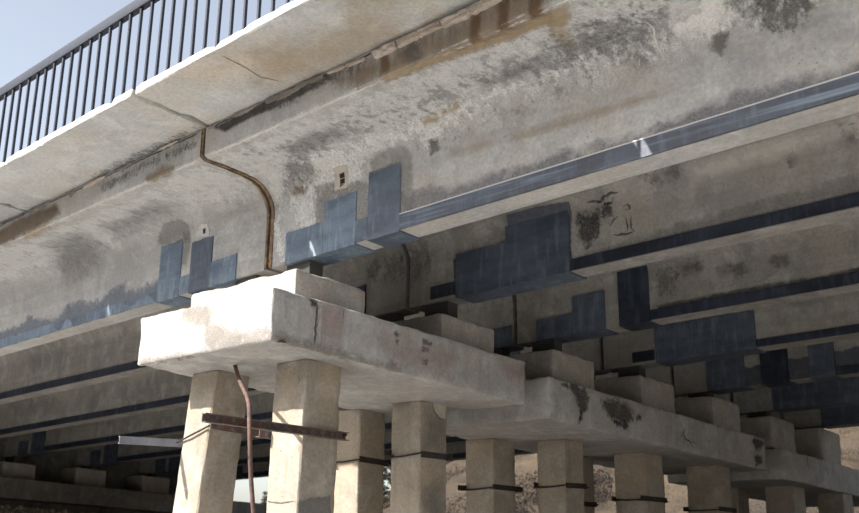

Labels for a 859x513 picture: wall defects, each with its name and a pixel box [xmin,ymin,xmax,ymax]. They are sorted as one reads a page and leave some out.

corrosion [340,0,570,85]
damp [0,0,829,286]
damp [138,313,204,360]
damp [214,290,276,331]
crack [310,298,318,347]